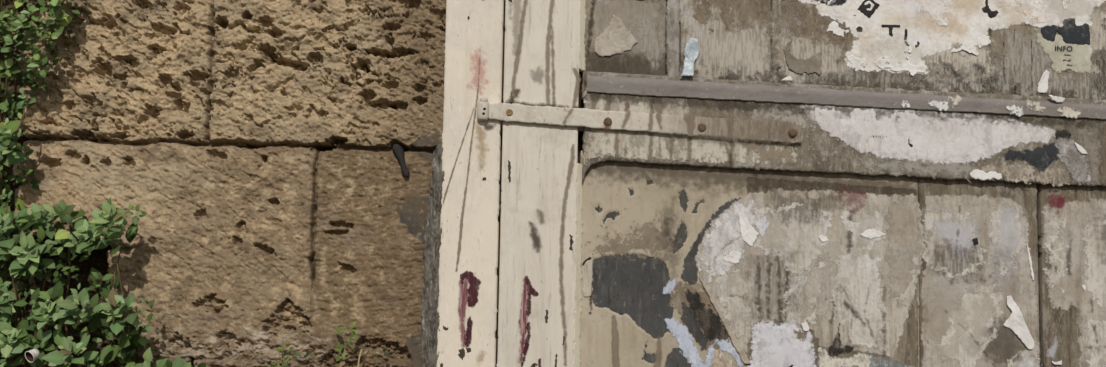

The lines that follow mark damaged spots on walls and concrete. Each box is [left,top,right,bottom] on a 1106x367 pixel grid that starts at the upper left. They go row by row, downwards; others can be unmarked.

peeling [582,190,742,367]